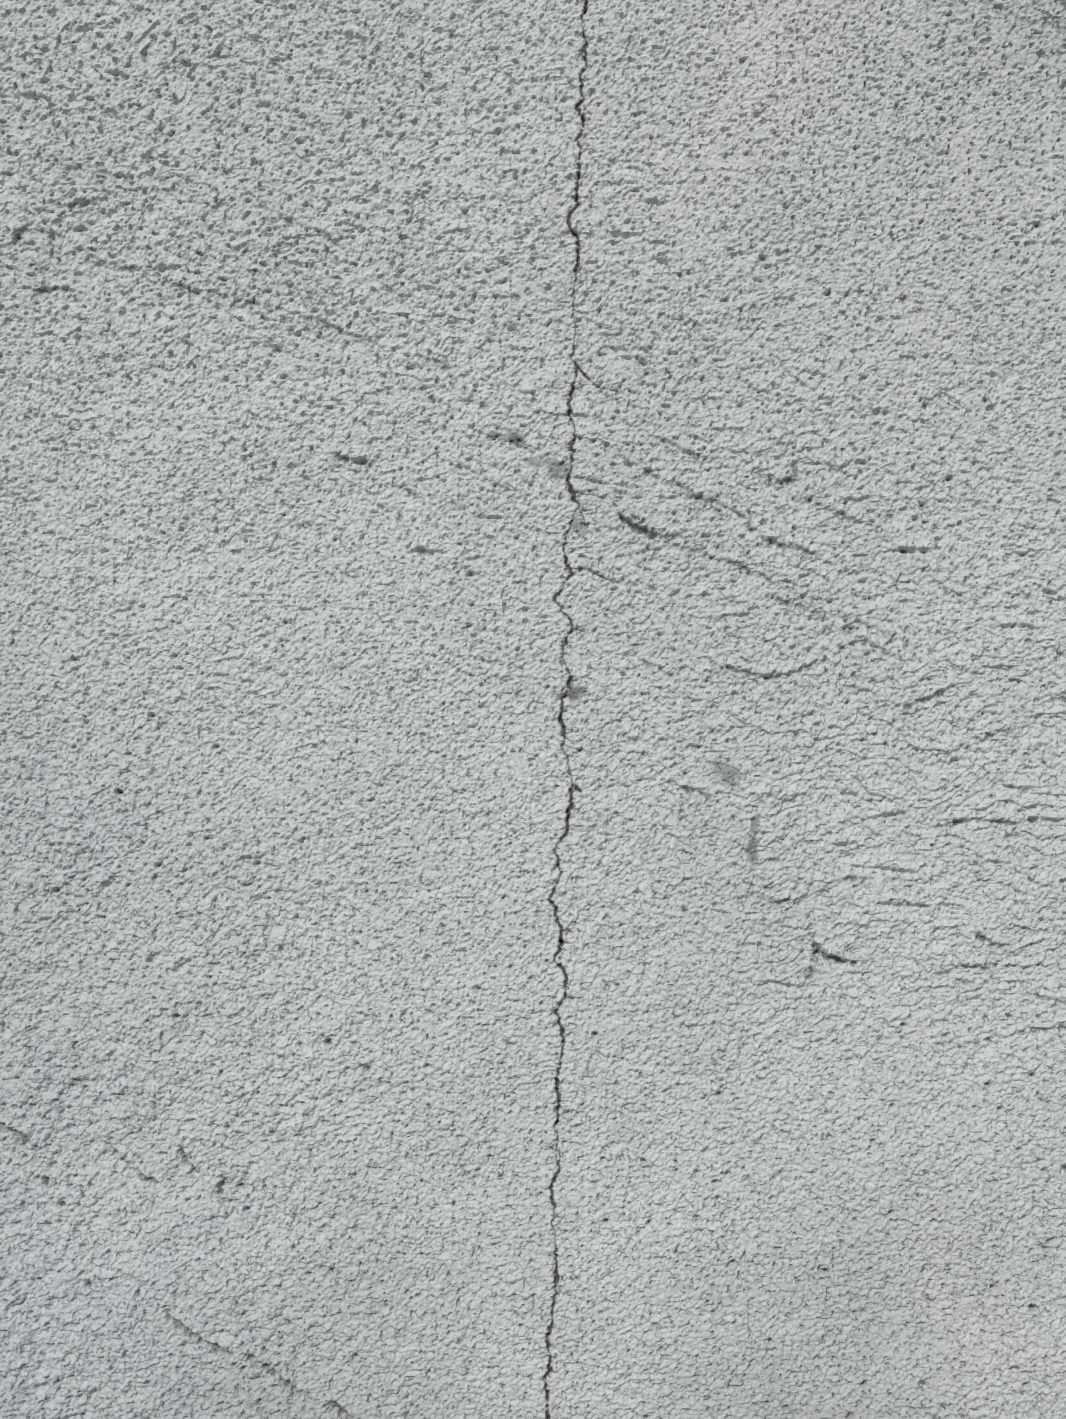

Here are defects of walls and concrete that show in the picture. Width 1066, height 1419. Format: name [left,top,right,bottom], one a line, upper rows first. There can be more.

crack [535,0,619,1419]